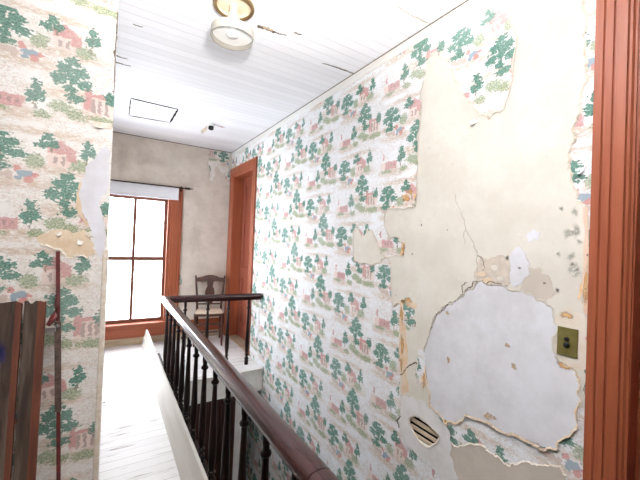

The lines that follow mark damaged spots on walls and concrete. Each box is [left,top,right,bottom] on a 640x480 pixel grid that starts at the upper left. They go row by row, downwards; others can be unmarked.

flaking render [75,144,111,258]
crack [430,193,507,330]
flaking render [399,247,582,480]